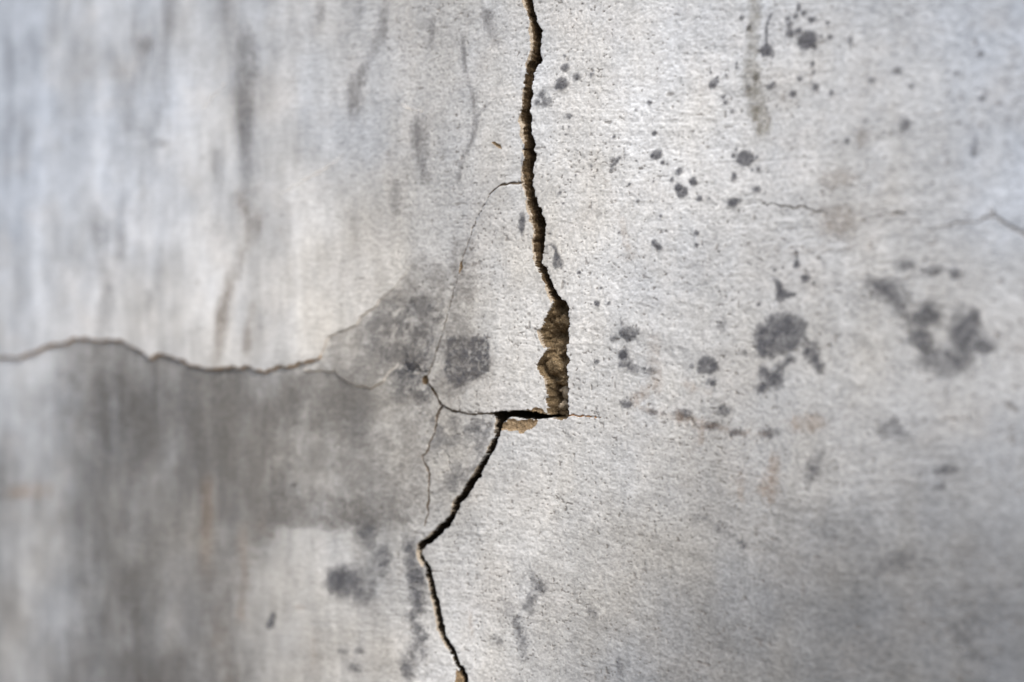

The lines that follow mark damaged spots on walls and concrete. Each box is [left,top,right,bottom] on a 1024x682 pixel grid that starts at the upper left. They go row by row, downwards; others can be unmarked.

damp [758,14,774,57]
damp [786,4,832,71]
damp [651,150,710,201]
damp [732,148,760,179]
damp [774,251,815,301]
damp [873,282,898,307]
damp [444,336,489,388]
crack [416,0,601,682]
damp [756,315,822,392]
damp [910,306,992,369]
damp [328,567,362,595]
damp [402,544,425,675]